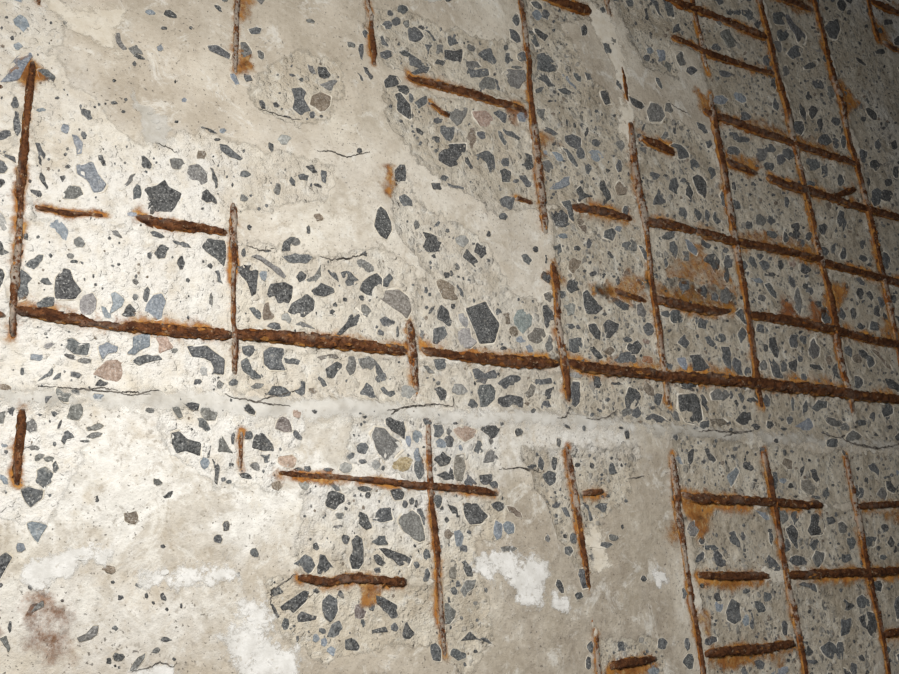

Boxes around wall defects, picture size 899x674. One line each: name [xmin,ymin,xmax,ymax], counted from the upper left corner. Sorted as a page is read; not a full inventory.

rust [233,55,253,74]
spalling [373,205,393,240]
rust [567,353,736,388]
spalling [842,337,899,395]
spalling [123,511,139,525]
rust [671,482,752,539]
spalling [156,399,550,674]
spalling [669,432,899,674]
rust [322,573,403,606]
rust [685,570,765,643]
spalling [76,625,99,643]
rust [710,642,799,670]